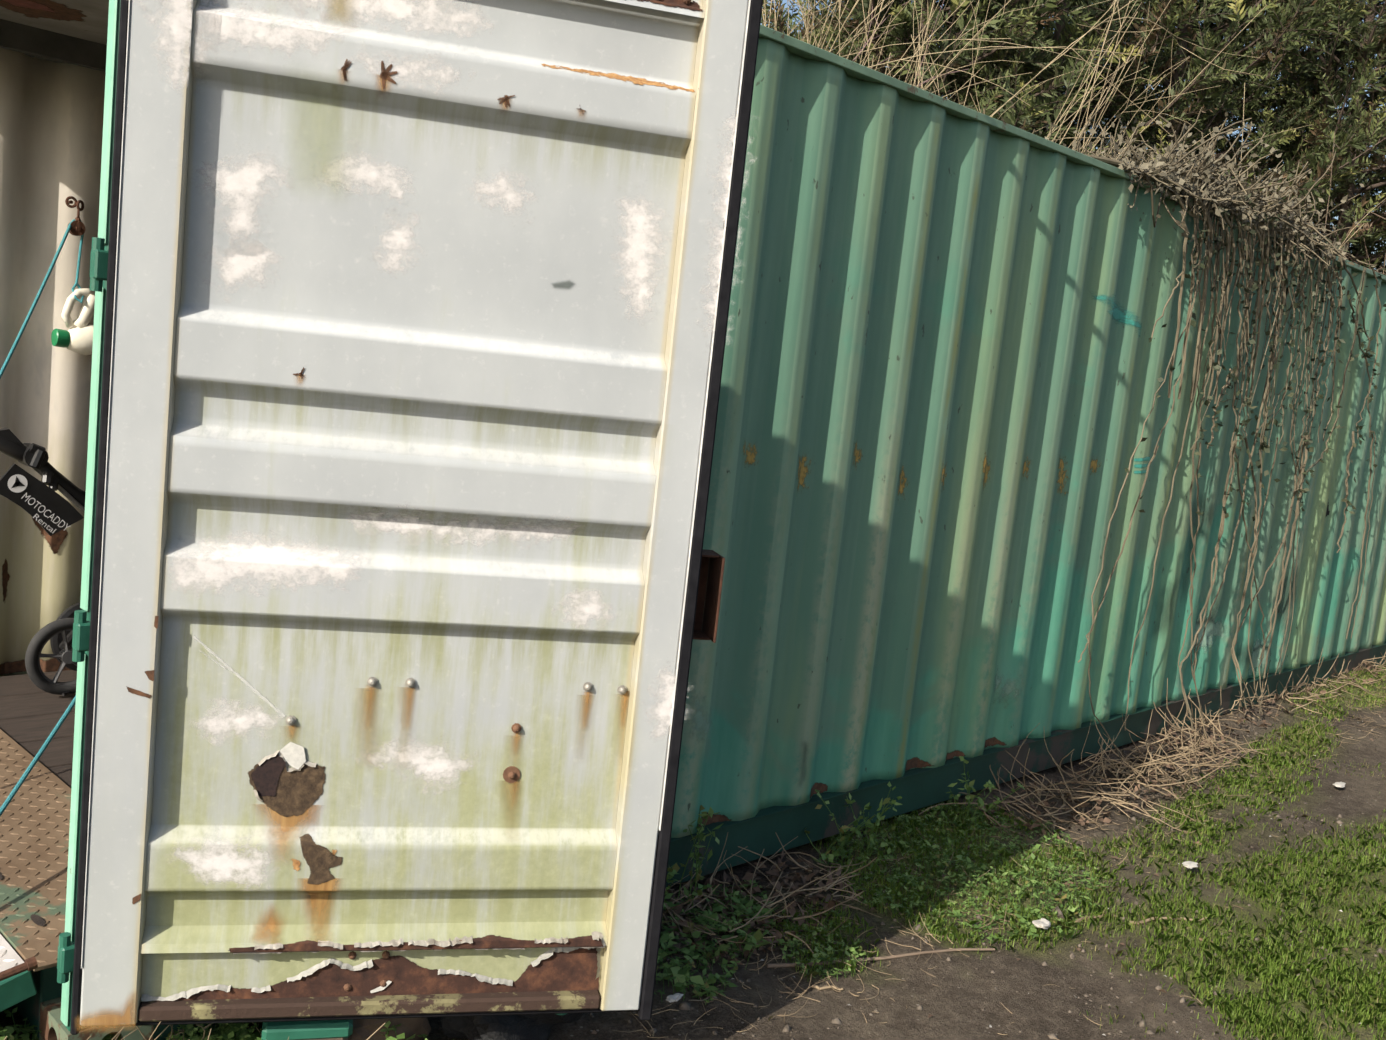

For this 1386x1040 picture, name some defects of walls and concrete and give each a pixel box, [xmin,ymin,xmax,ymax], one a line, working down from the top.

peeling [639,0,702,11]
corrosion [379,60,397,91]
peeling [324,157,406,199]
peeling [476,174,532,210]
peeling [203,158,282,285]
peeling [381,218,418,271]
corrosion [363,686,374,736]
corrosion [905,750,965,771]
corrosion [266,806,343,923]